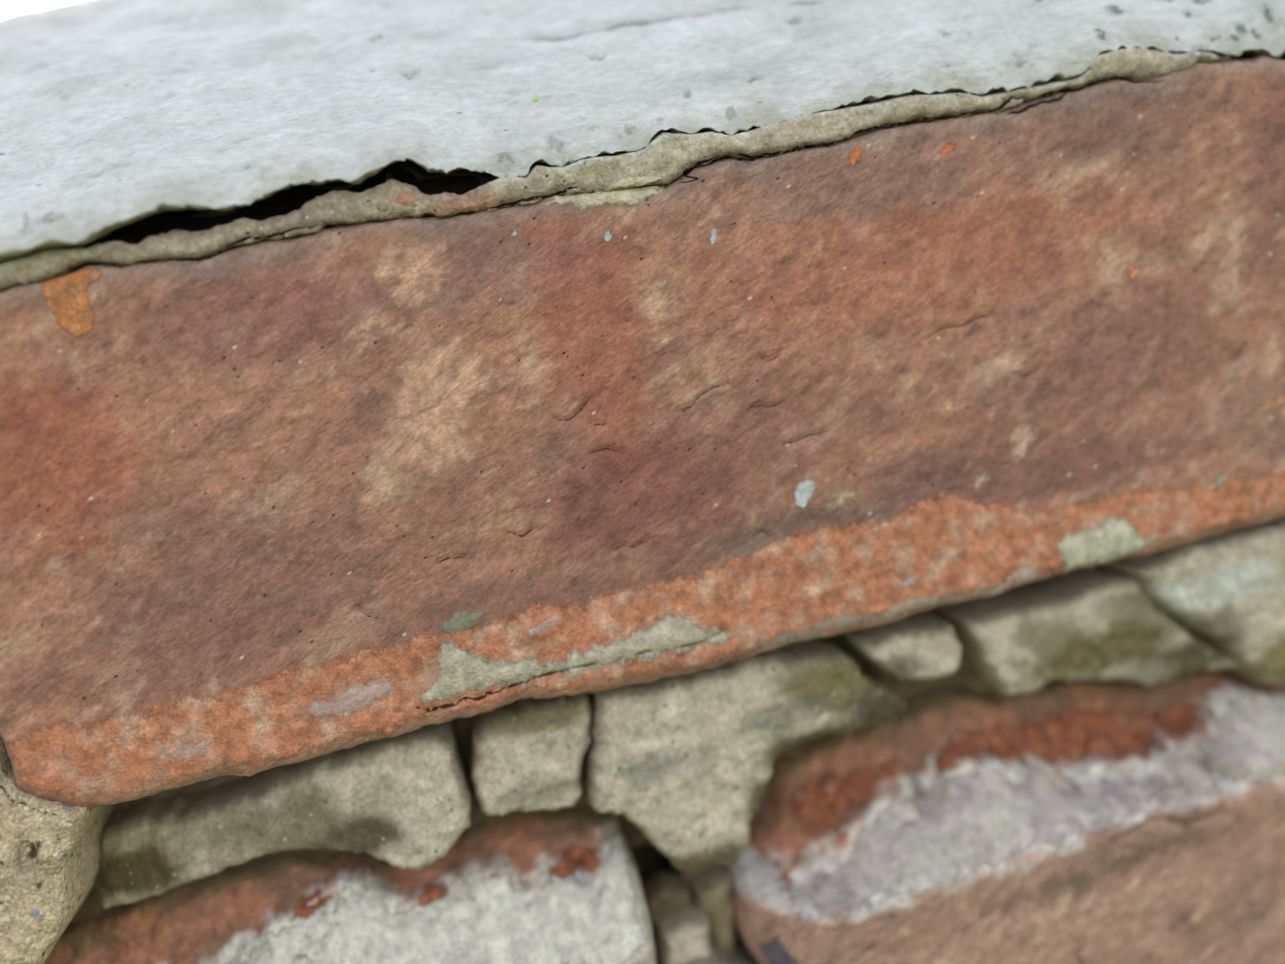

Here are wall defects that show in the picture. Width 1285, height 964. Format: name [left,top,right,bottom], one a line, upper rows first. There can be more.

crack [673,75,1164,183]
crack [82,166,586,261]
spalling [790,758,905,837]
spalling [291,888,332,920]
spalling [412,881,449,908]
spalling [549,845,602,879]
spalling [774,852,801,900]